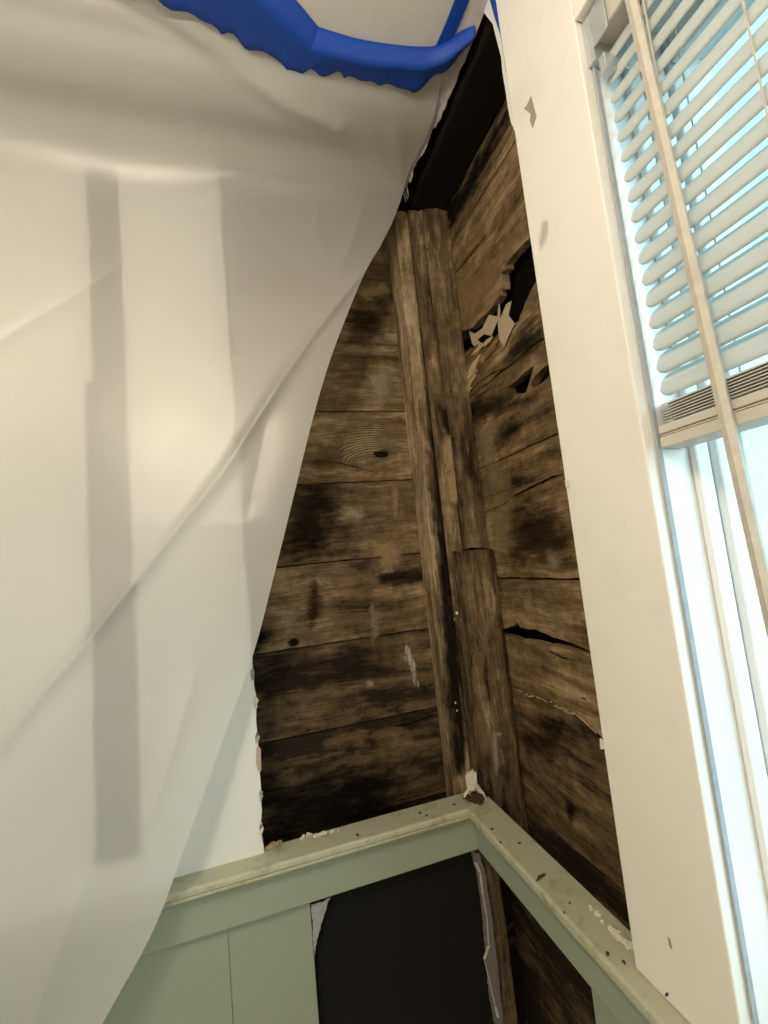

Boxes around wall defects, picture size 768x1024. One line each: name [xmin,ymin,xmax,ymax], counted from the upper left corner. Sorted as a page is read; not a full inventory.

water stain [470,392,567,570]
crack [503,626,587,660]
flaking render [463,769,487,802]
spalling [300,828,340,841]
peeling [474,862,499,1018]